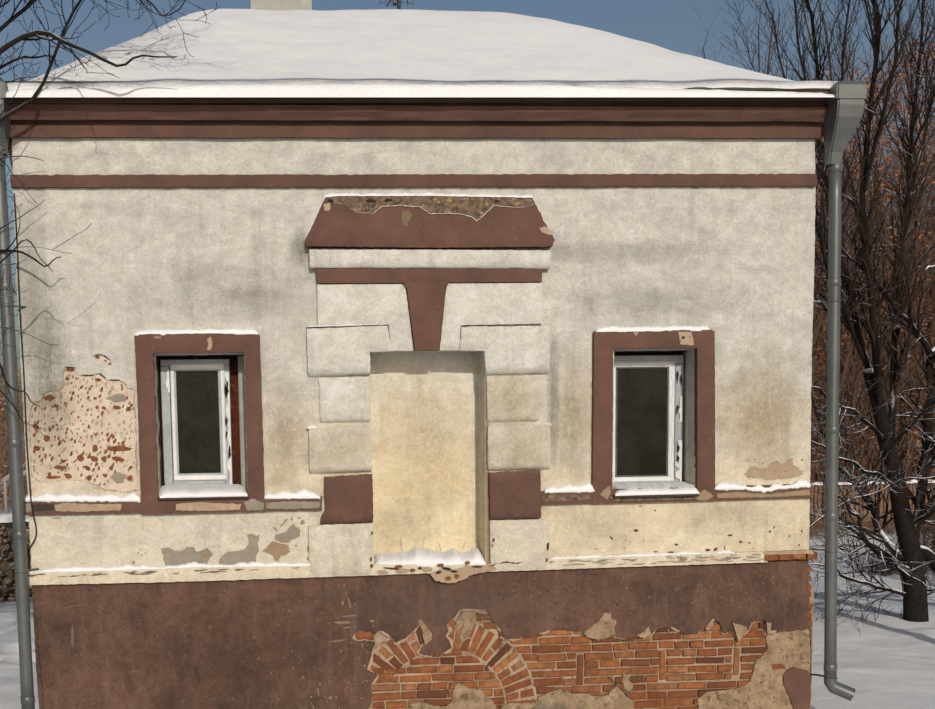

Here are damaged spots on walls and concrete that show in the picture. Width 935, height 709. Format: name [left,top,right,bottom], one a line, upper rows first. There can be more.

flaking render [323,196,534,226]
flaking render [29,367,139,493]
spalling [159,337,320,574]
peeling [743,458,805,481]
peeling [542,486,810,502]
peeling [25,502,122,519]
flaking render [352,549,817,709]